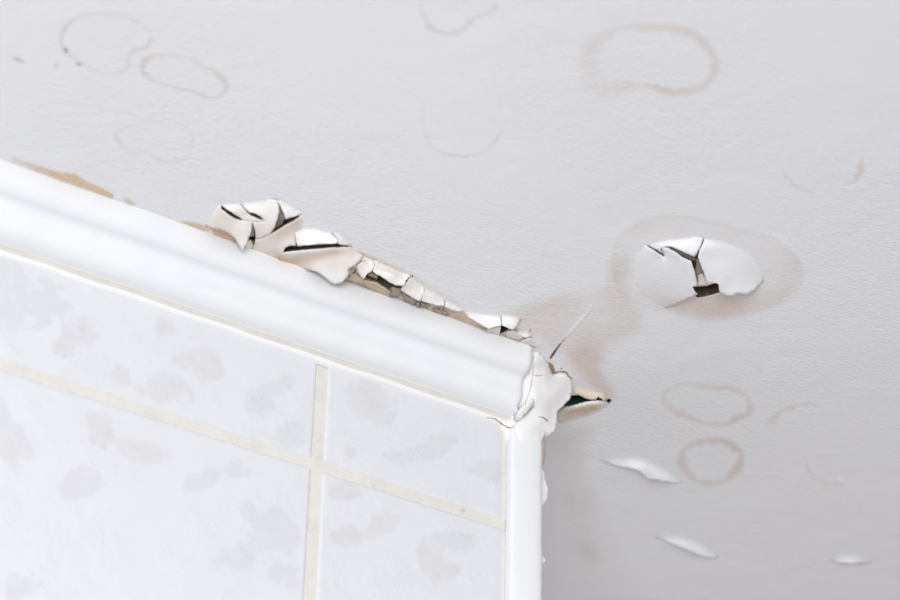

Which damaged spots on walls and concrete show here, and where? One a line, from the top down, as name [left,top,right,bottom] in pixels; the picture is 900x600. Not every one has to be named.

peeling [206,199,538,348]
peeling [558,386,611,423]
peeling [600,456,682,483]
peeling [655,534,718,559]